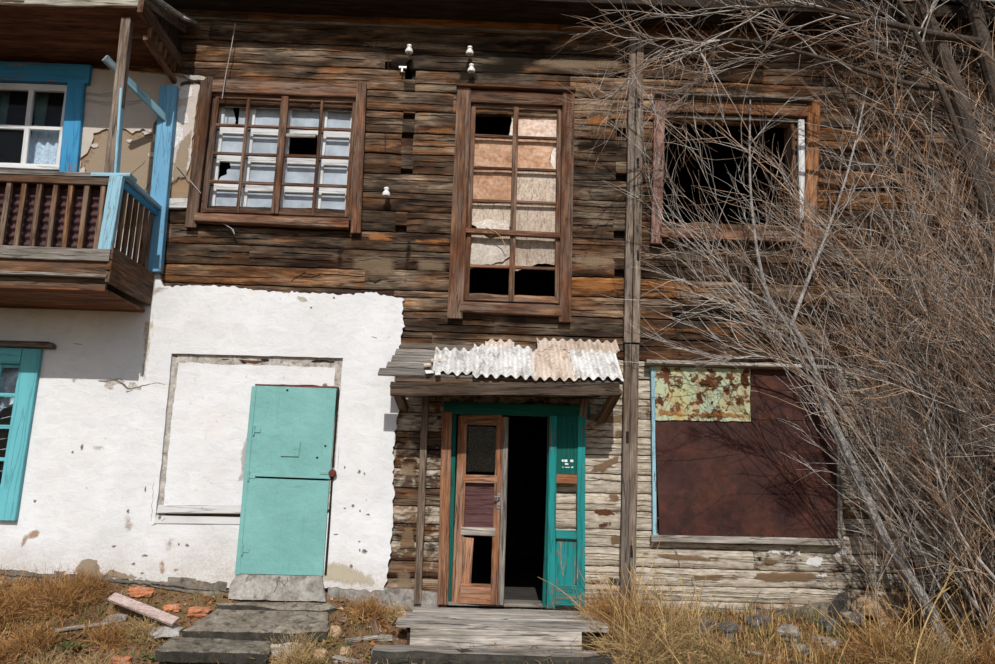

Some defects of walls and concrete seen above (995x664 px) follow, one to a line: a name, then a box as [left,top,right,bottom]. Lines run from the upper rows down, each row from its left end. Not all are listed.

peeling [81,133,108,173]
peeling [120,130,156,195]
peeling [172,74,206,181]
crack [98,378,162,392]
rust [655,369,839,538]